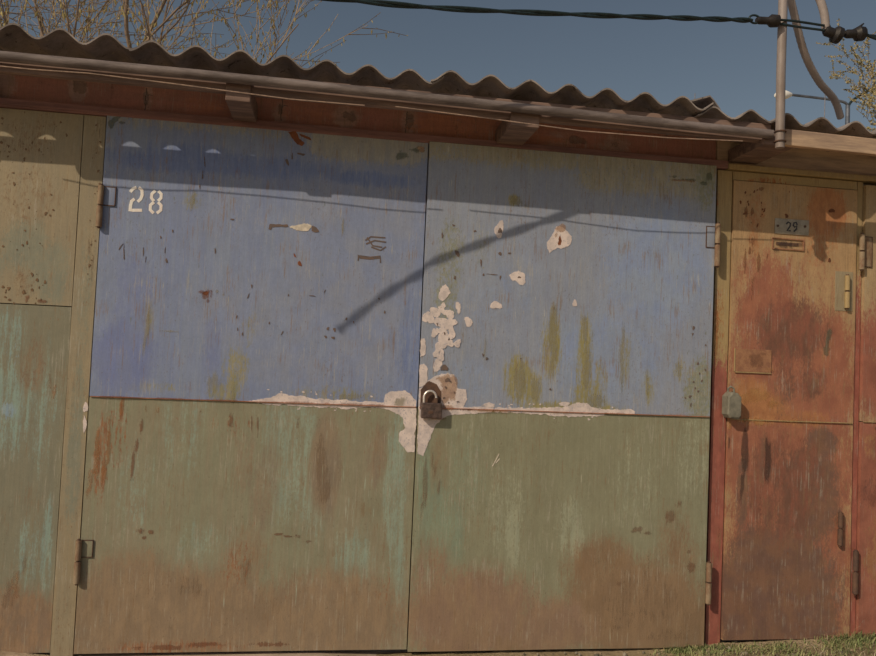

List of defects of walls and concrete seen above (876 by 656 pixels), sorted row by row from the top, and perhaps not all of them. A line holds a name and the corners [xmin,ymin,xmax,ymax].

peeling [547,226,572,253]
peeling [509,271,526,285]
peeling [252,284,635,456]
rust [740,430,748,496]